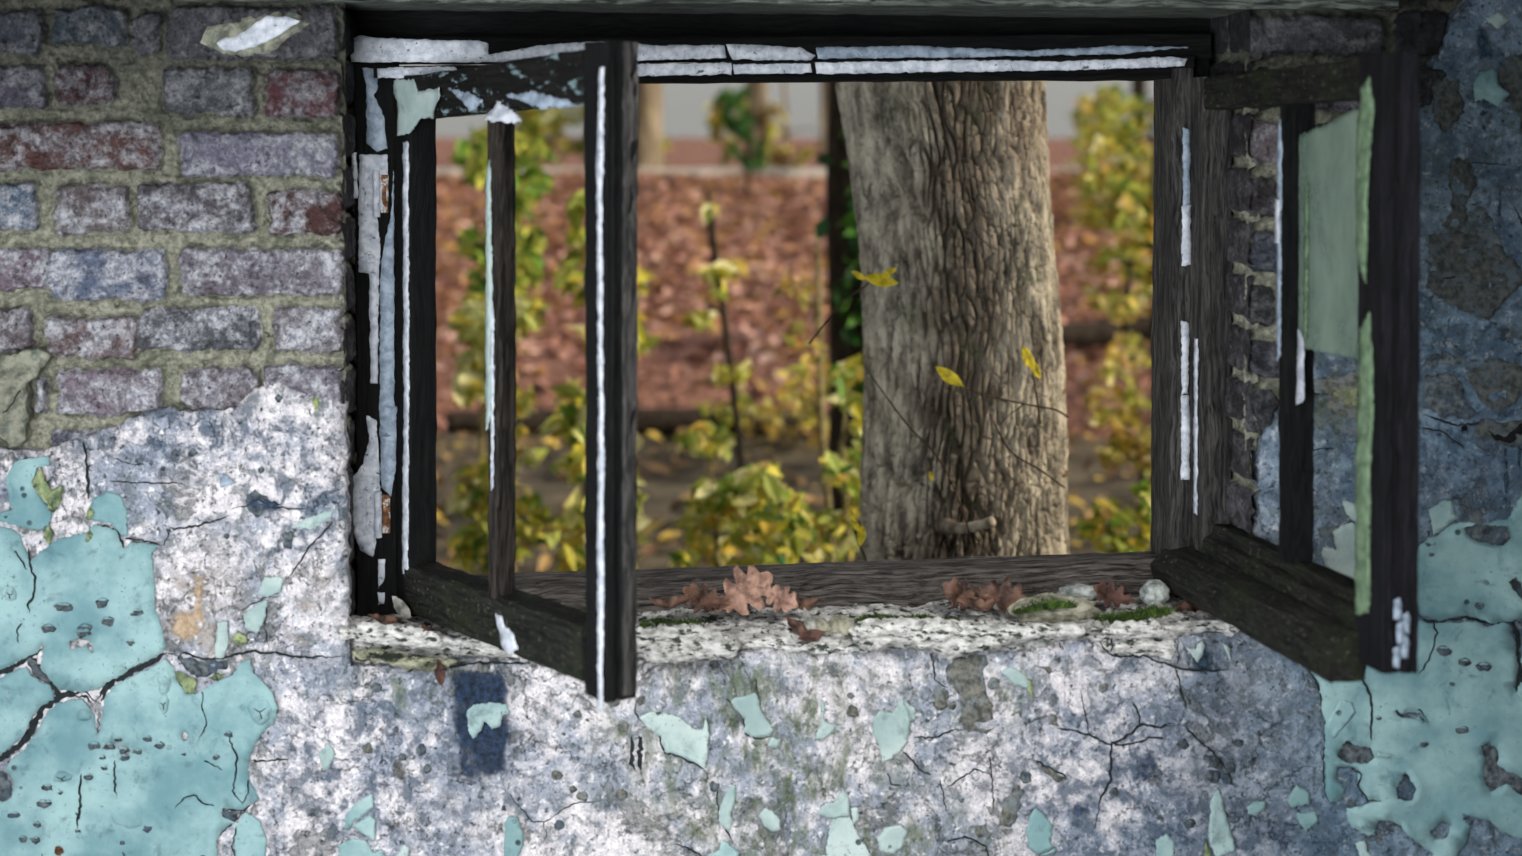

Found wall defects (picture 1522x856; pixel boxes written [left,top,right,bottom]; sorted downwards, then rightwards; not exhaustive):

flaking render [217,15,300,52]
spalling [1425,157,1522,320]
spalling [1423,358,1522,448]
peeling [0,455,284,856]
crack [0,441,345,856]
peeling [729,693,780,749]
spalling [932,655,1052,734]
crack [887,638,1233,856]
peeling [1288,496,1522,856]
peeling [759,808,781,832]
peeling [817,788,908,856]
peeling [974,762,1067,856]